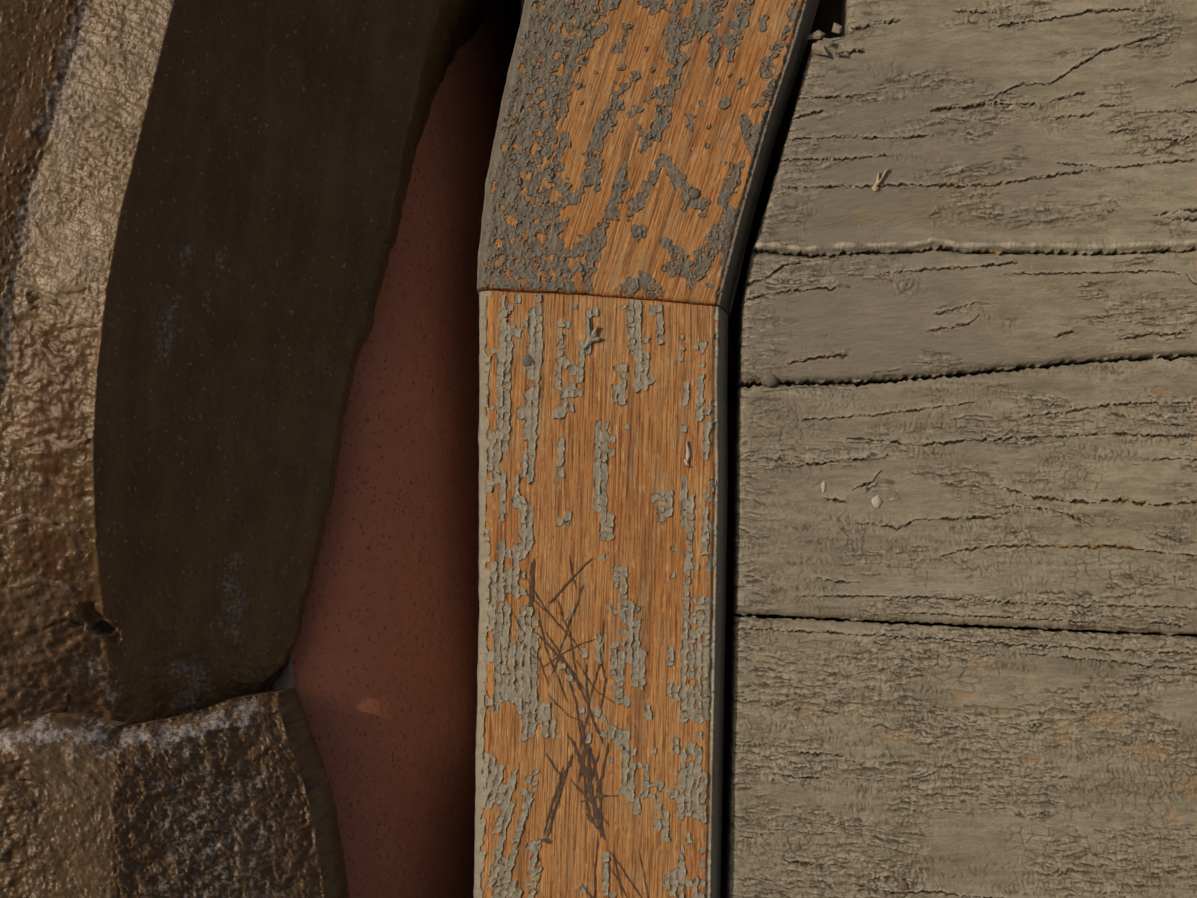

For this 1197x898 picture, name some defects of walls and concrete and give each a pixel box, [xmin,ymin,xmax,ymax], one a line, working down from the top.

crack [780,6,1197,189]
crack [1156,209,1197,222]
crack [742,259,849,302]
crack [880,259,1197,285]
crack [790,350,847,365]
crack [1124,332,1182,340]
peeling [475,0,818,898]
crack [793,401,1197,557]
crack [745,577,1197,670]
damp [0,653,298,898]
crack [775,752,842,779]
crack [784,858,993,898]